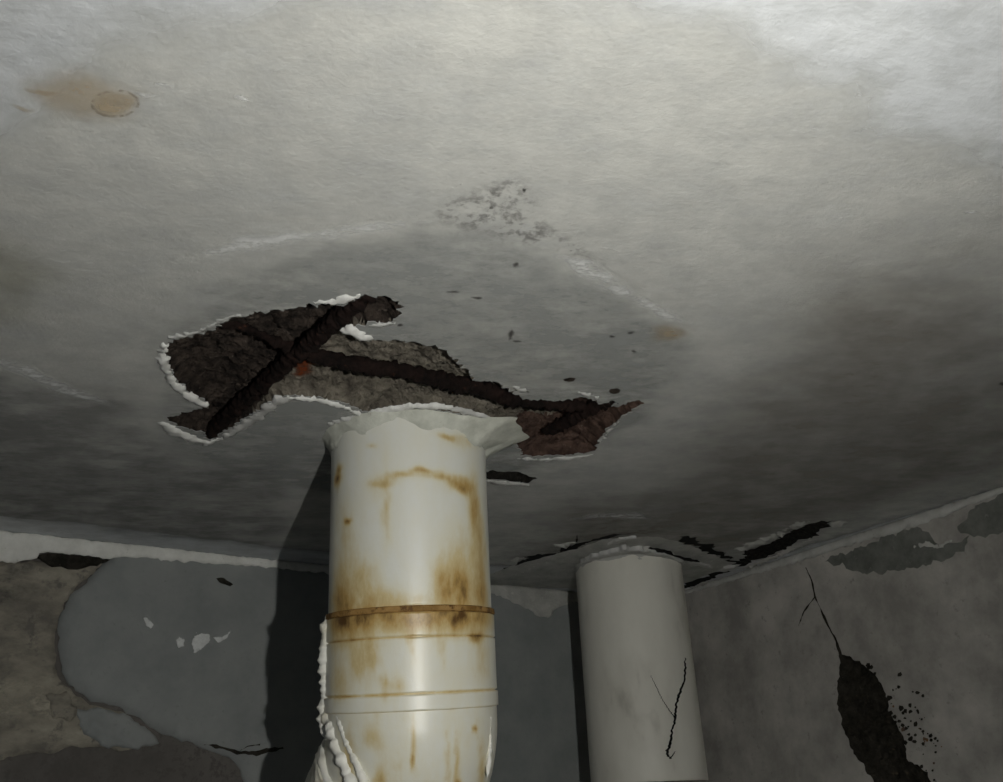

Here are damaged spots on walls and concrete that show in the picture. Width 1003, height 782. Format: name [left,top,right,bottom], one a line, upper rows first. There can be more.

water stain [0,0,1003,566]
spalling [155,294,644,462]
flaking render [0,530,329,760]
spalling [486,470,537,487]
crack [494,534,622,581]
crack [648,520,848,655]
peeling [685,487,1003,593]
flaking render [837,655,942,782]